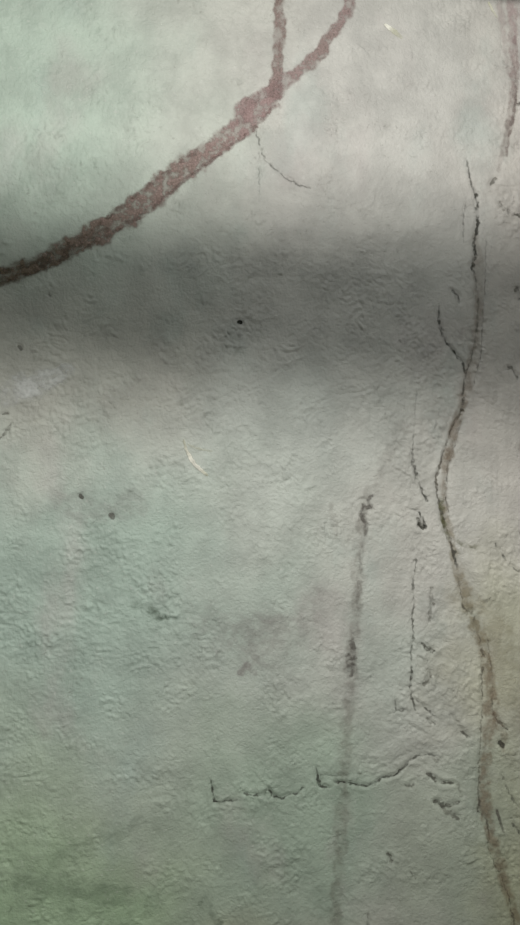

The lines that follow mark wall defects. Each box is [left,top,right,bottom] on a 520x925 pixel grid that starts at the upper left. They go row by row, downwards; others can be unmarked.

crack [469,175,480,270]
crack [437,311,465,431]
crack [413,458,456,562]
crack [211,787,297,802]
crack [316,757,415,788]